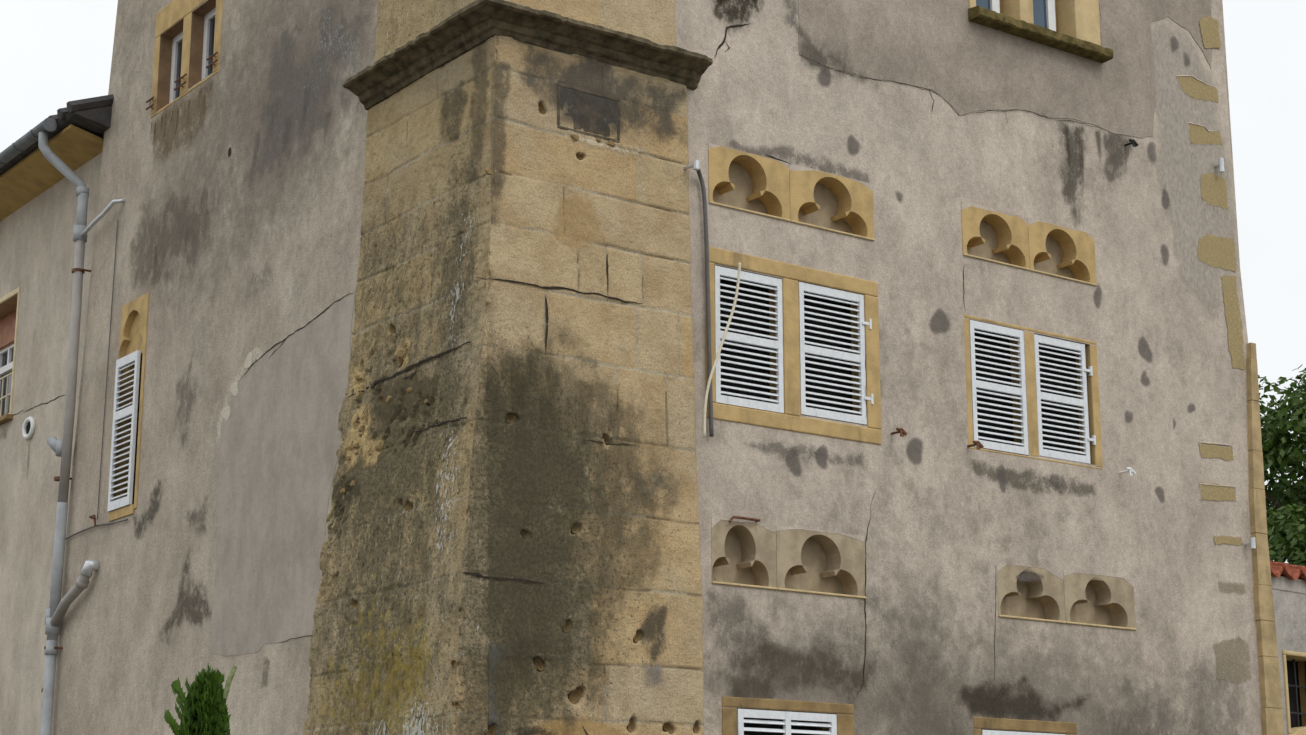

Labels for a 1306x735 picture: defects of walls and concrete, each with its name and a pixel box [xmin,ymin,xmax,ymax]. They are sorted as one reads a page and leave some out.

leakage [714,0,759,25]
crack [800,54,1105,129]
leakage [1063,129,1083,215]
leakage [1097,132,1131,181]
crack [239,293,352,381]
leakage [135,483,160,535]
leakage [165,563,209,633]